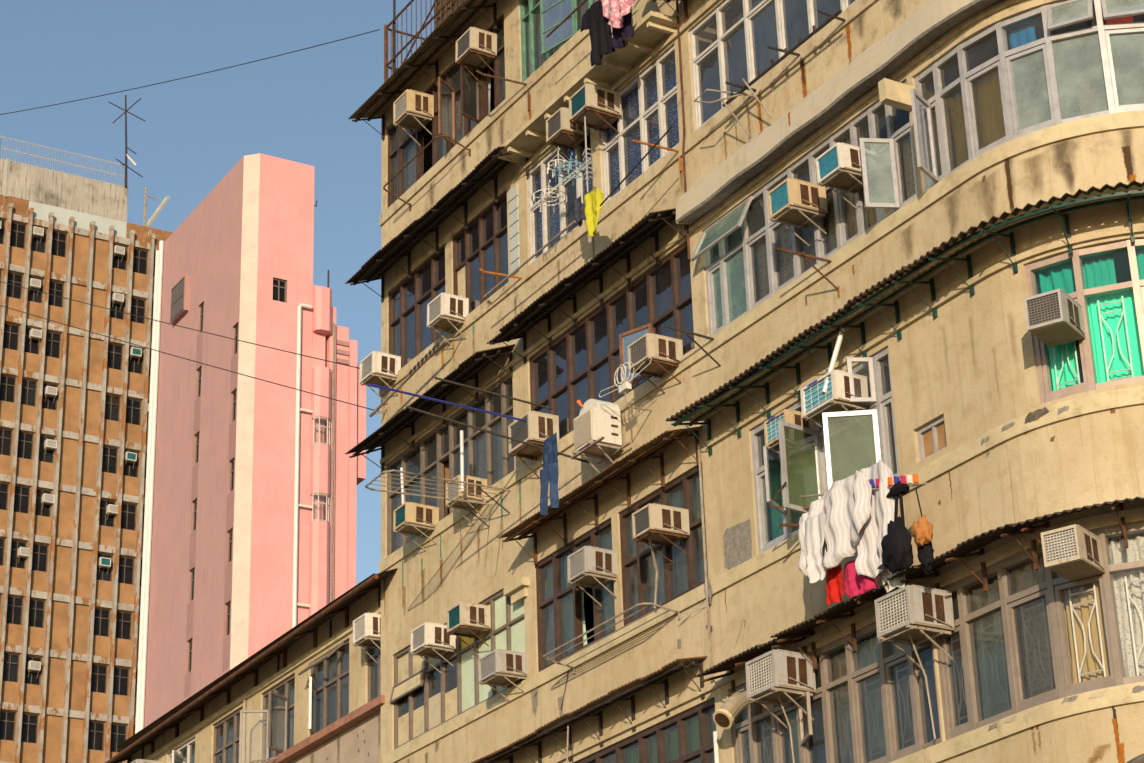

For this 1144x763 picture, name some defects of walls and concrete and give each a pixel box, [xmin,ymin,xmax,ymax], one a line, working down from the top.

corrosion [1112,718,1124,763]